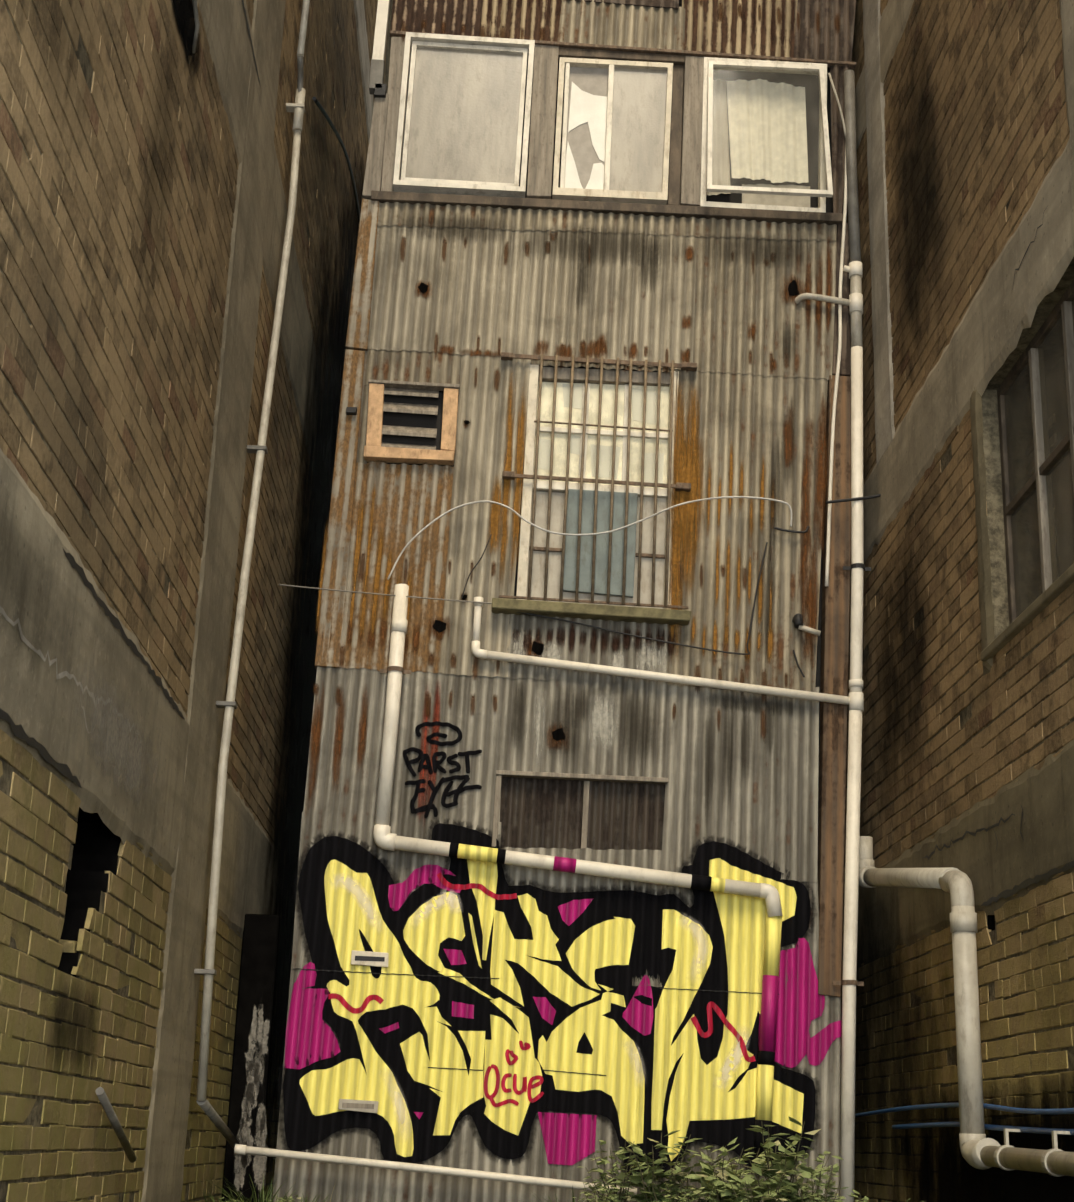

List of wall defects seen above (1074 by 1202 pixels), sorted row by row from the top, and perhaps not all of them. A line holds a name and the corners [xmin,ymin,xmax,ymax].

rust [488,0,560,40]
rust [738,1,799,45]
rust [535,336,606,366]
rust [624,343,648,370]
rust [434,334,525,576]
rust [317,489,449,666]
rust [513,392,775,737]
rust [785,398,827,660]
crack [0,606,138,734]
spalling [59,939,77,953]
peeling [234,1006,270,1195]